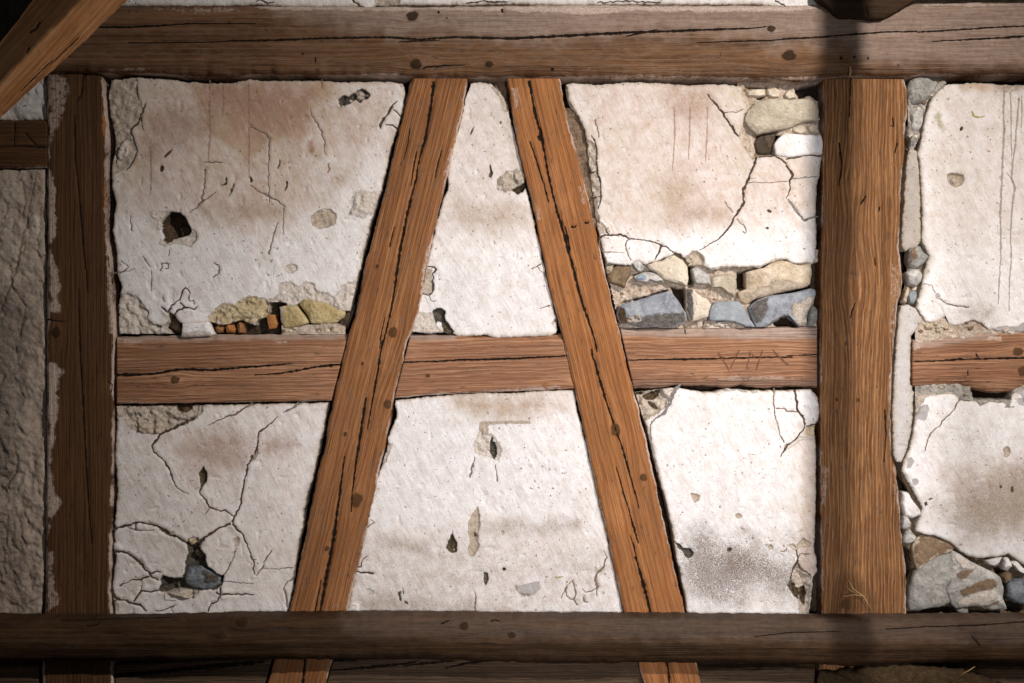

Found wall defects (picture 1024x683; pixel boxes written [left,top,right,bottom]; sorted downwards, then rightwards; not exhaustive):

spalling [150,210,196,247]
spalling [686,251,813,270]
spalling [182,264,357,336]
crack [47,64,843,627]
crack [925,399,961,451]
spalling [788,538,812,550]
spalling [787,565,812,613]